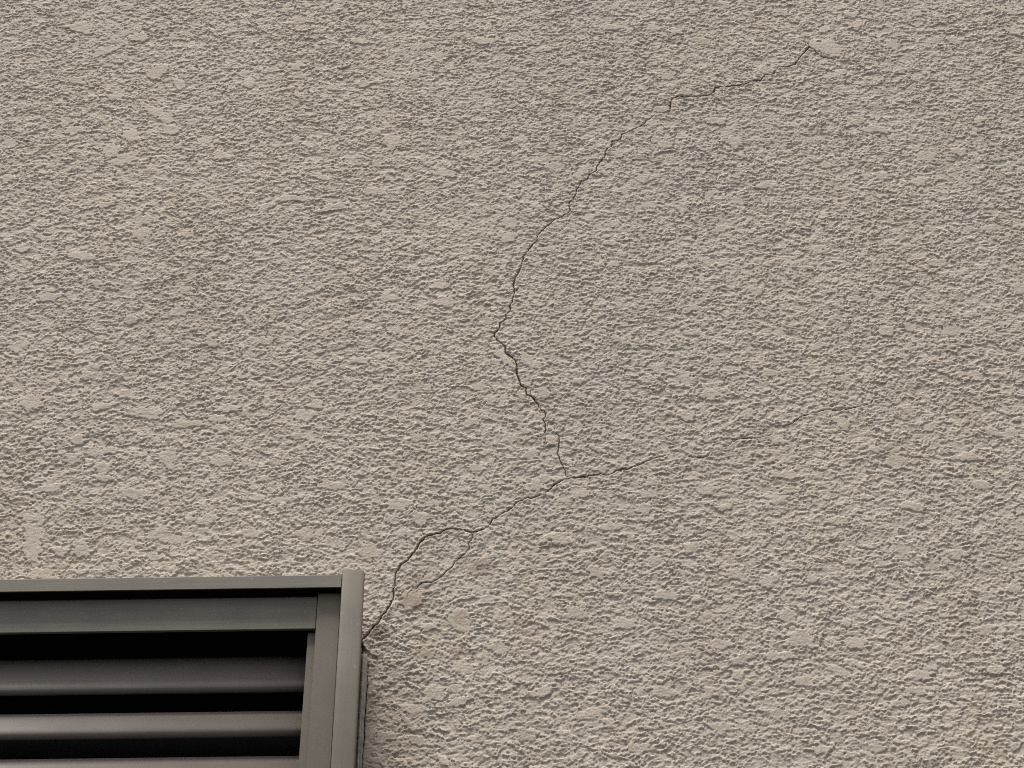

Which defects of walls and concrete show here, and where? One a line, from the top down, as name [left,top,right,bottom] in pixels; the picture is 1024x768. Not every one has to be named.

crack [361,46,892,768]